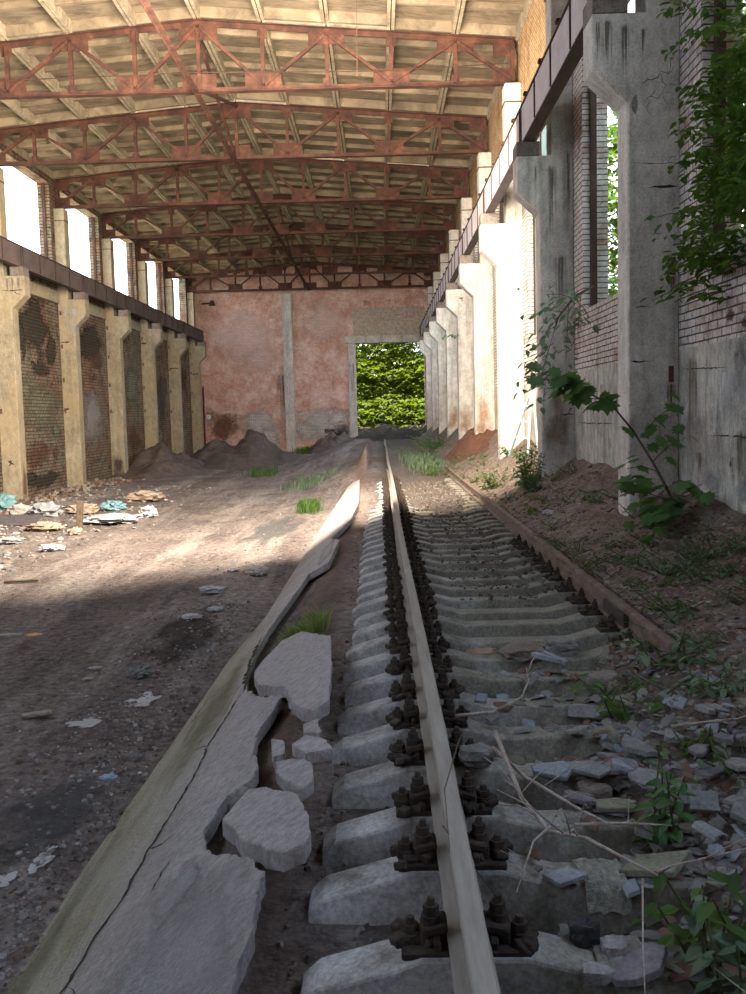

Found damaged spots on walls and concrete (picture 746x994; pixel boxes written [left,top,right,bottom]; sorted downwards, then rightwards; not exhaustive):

leakage [596,21,610,50]
crack [641,55,677,119]
leakage [157,376,166,428]
crack [60,637,262,994]